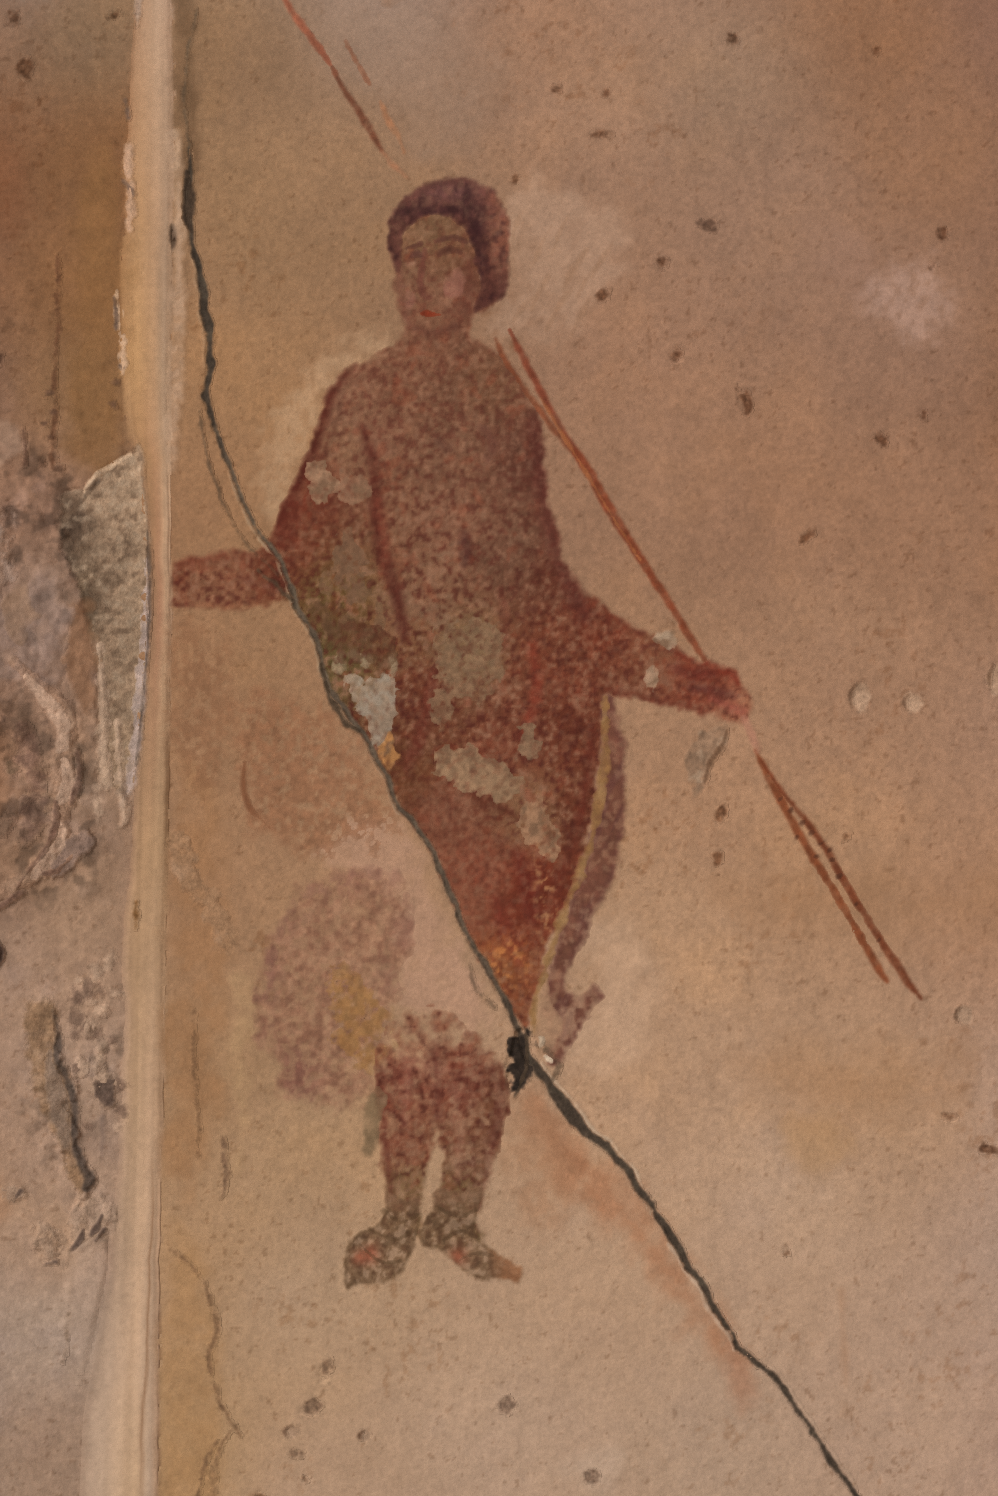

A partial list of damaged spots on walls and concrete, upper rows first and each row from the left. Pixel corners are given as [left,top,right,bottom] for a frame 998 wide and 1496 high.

spalling [0,388,154,912]
crack [167,7,862,1496]
spalling [21,946,131,1266]